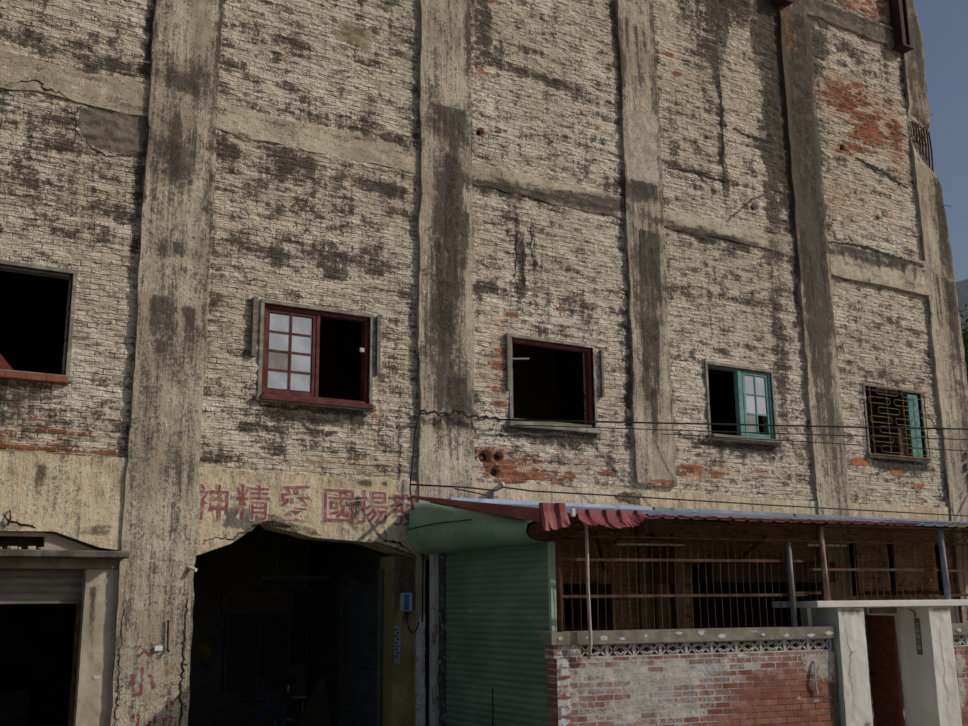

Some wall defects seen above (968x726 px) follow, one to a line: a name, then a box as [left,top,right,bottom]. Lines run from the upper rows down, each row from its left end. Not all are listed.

crack [17,80,131,157]
peeling [814,80,934,176]
damp [673,0,923,373]
damp [935,183,950,259]
damp [433,154,469,445]
damp [638,230,662,300]
damp [642,318,661,447]
peeling [0,416,124,457]
peeling [475,447,576,485]
crack [174,599,189,726]
peeling [557,655,782,726]
peeling [801,651,835,682]